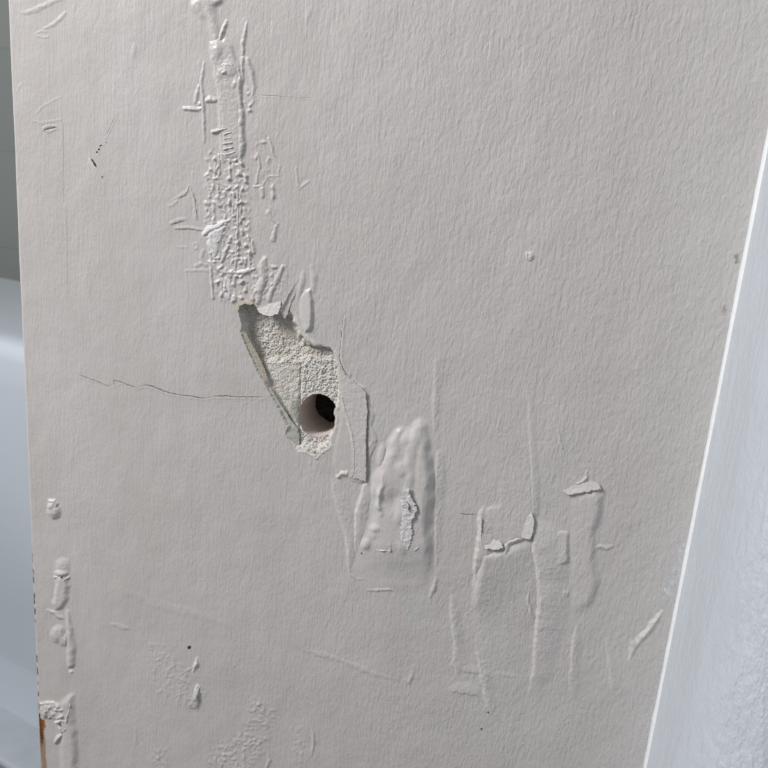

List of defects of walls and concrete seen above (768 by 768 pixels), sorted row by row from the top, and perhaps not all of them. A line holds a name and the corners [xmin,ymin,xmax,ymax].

peeling [201,218,231,258]
crack [76,373,267,401]
spalling [223,276,378,568]